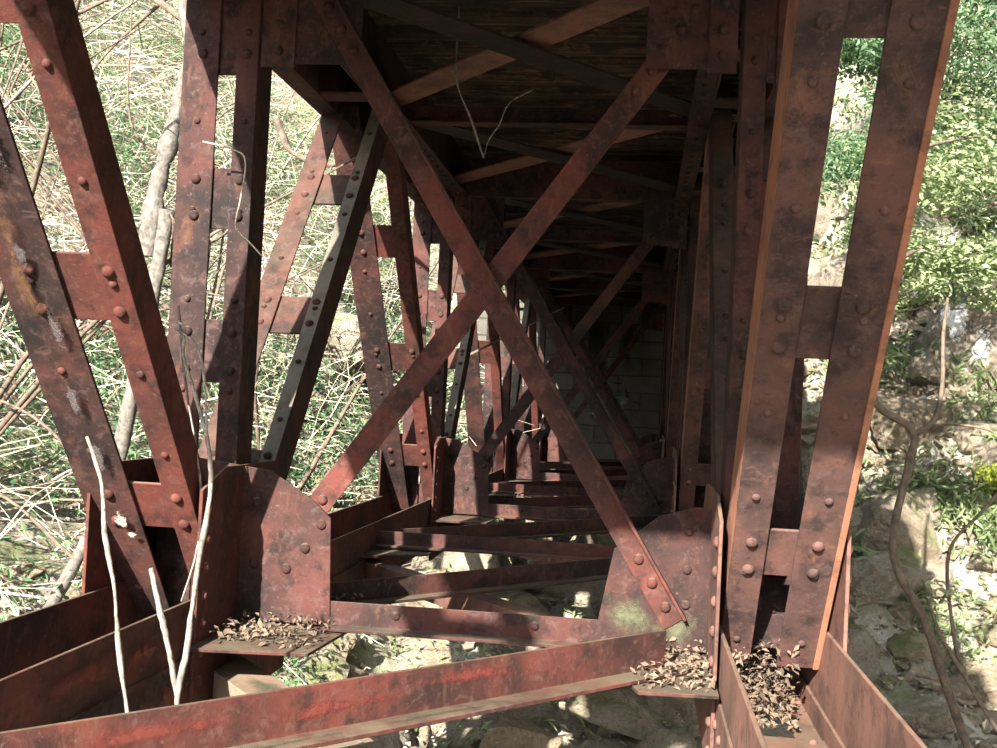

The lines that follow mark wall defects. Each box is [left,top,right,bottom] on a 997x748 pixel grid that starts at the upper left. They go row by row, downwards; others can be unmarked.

corrosion [2,223,35,304]
corrosion [48,313,63,346]
corrosion [67,387,80,414]
corrosion [80,669,172,719]